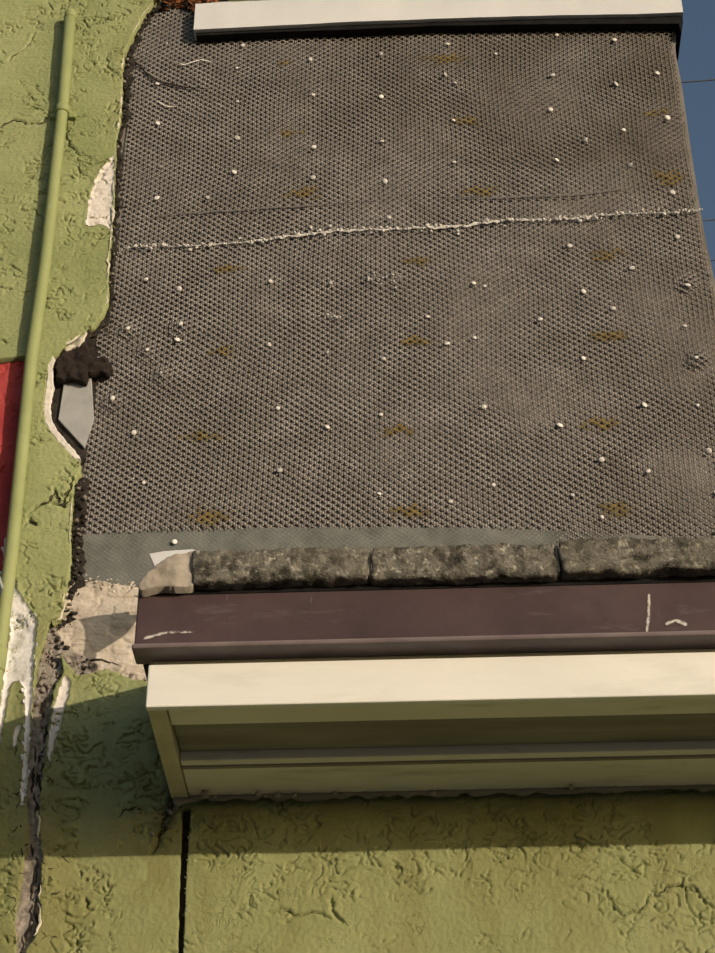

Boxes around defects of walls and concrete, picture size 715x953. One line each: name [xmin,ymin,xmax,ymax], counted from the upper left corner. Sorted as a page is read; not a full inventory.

rust [153,0,215,12]
spalling [43,0,169,463]
spalling [52,475,147,682]
crack [0,625,99,953]